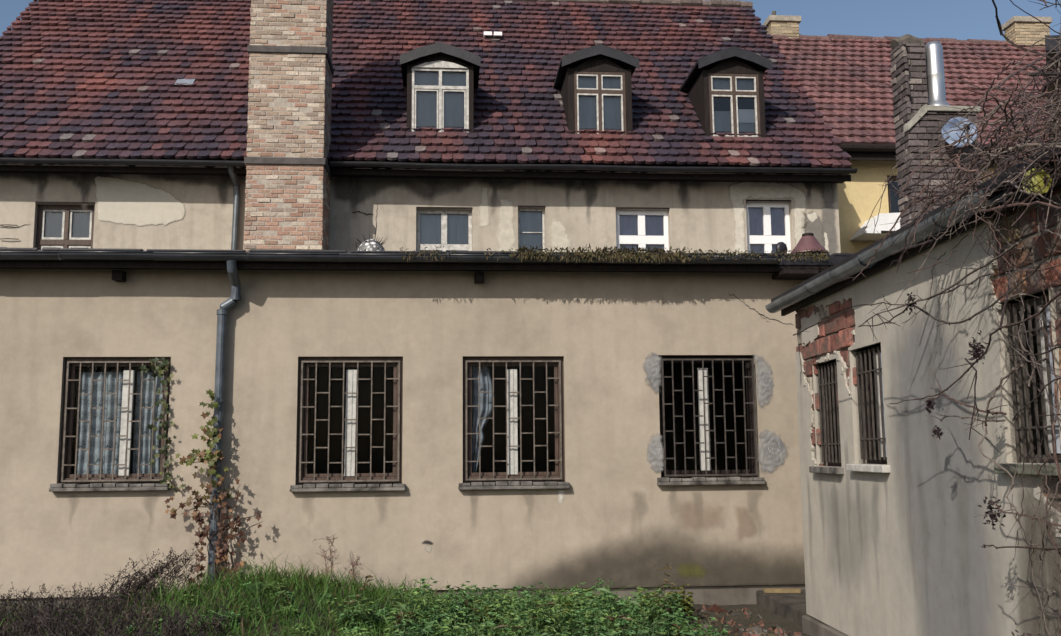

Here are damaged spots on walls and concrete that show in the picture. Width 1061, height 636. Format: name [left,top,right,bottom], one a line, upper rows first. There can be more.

water stain [480,179,515,251]
water stain [551,221,571,252]
spalling [795,299,859,445]
water stain [900,328,987,636]
water stain [522,544,805,590]